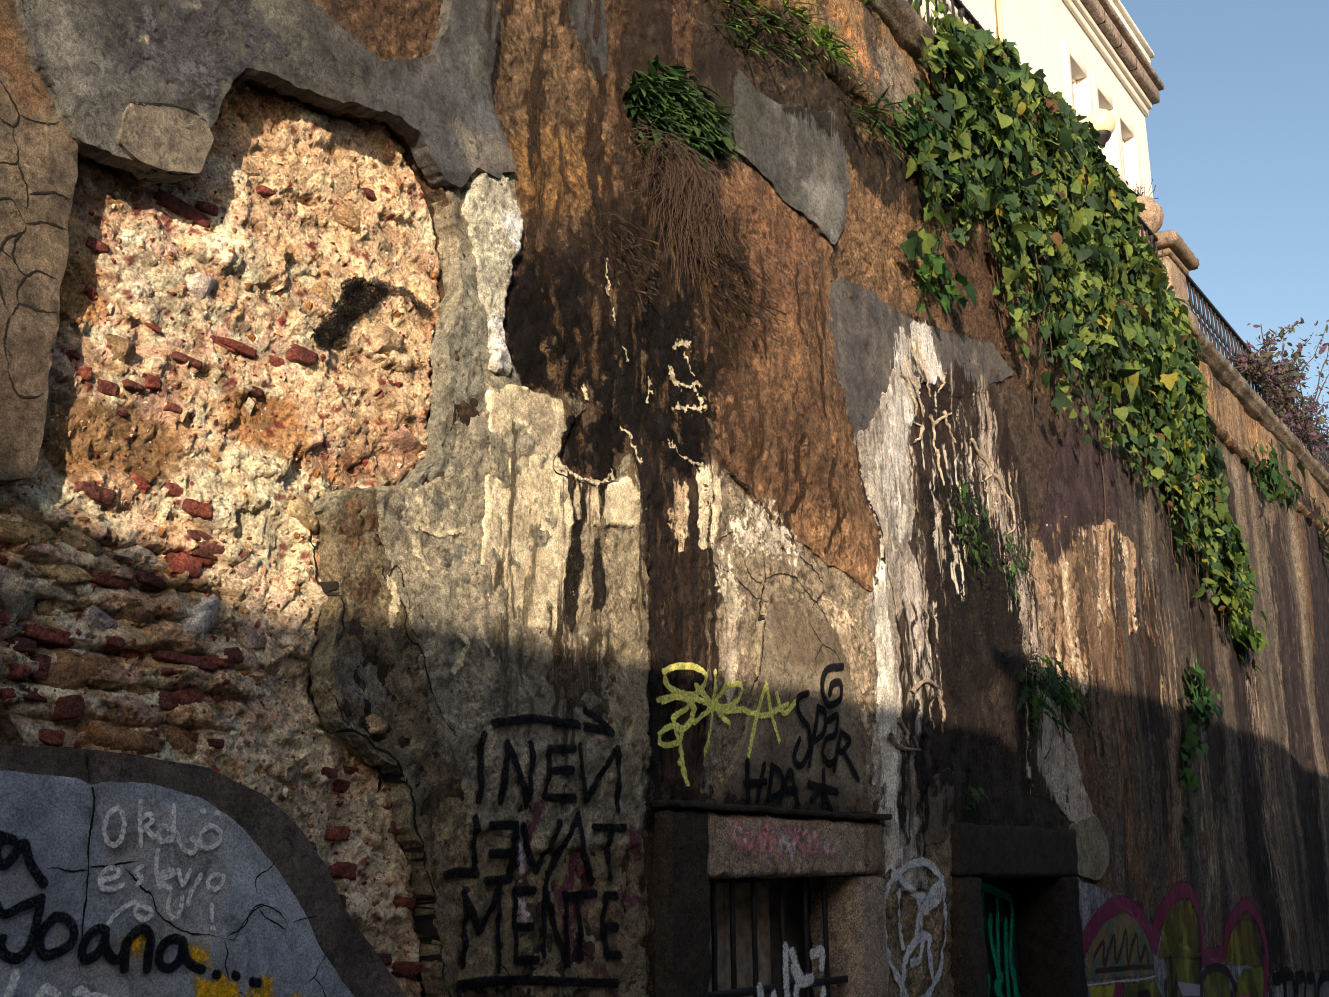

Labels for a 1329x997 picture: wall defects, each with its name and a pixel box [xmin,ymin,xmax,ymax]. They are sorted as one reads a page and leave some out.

crack [0,81,69,398]
spalling [0,0,517,997]
damp [461,0,1329,997]
crack [44,754,317,997]
crack [305,950,330,997]